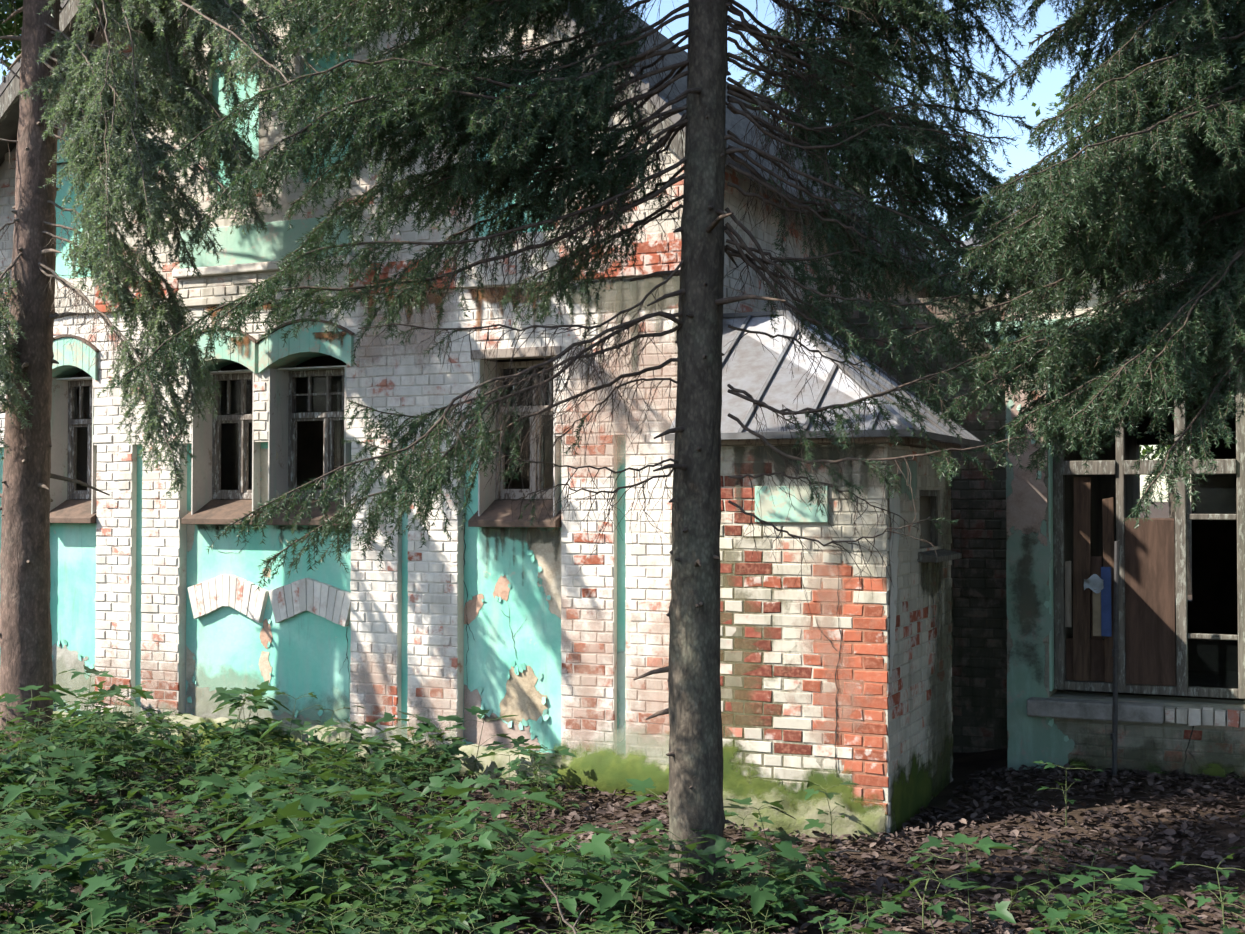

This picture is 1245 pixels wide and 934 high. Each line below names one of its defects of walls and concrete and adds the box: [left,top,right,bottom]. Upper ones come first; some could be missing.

spalling [555,413,613,455]
spalling [721,463,772,536]
peeling [464,572,511,624]
peeling [526,522,615,619]
leakage [1012,533,1041,679]
peeling [52,639,350,740]
peeling [258,619,273,685]
spalling [366,684,415,738]
peeling [464,660,550,753]
spalling [562,643,605,675]
spalling [565,698,615,752]
spalling [720,490,937,815]